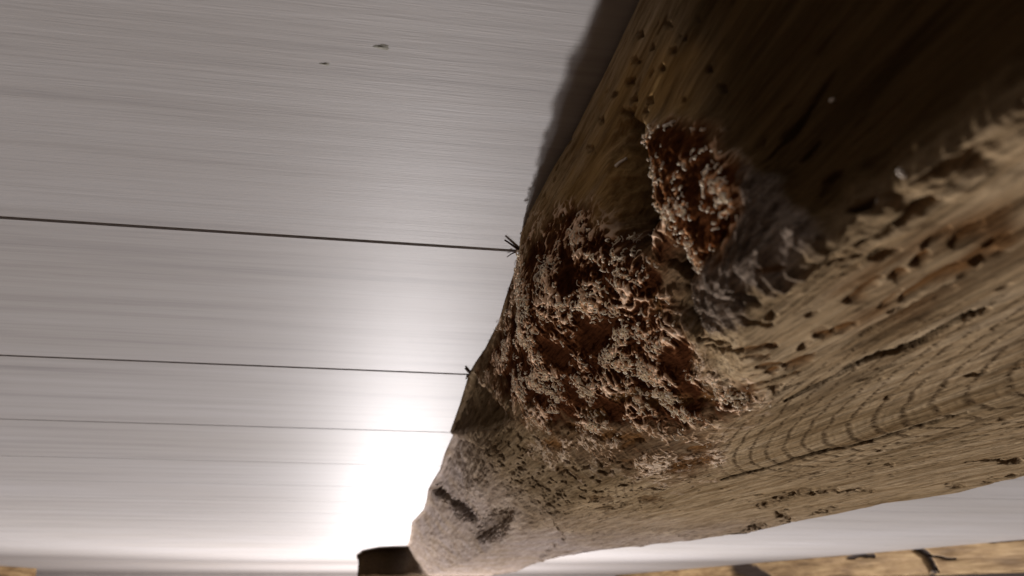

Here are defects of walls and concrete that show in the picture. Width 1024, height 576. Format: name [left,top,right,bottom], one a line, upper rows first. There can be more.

peeling [478,120,771,455]
crack [721,411,969,482]